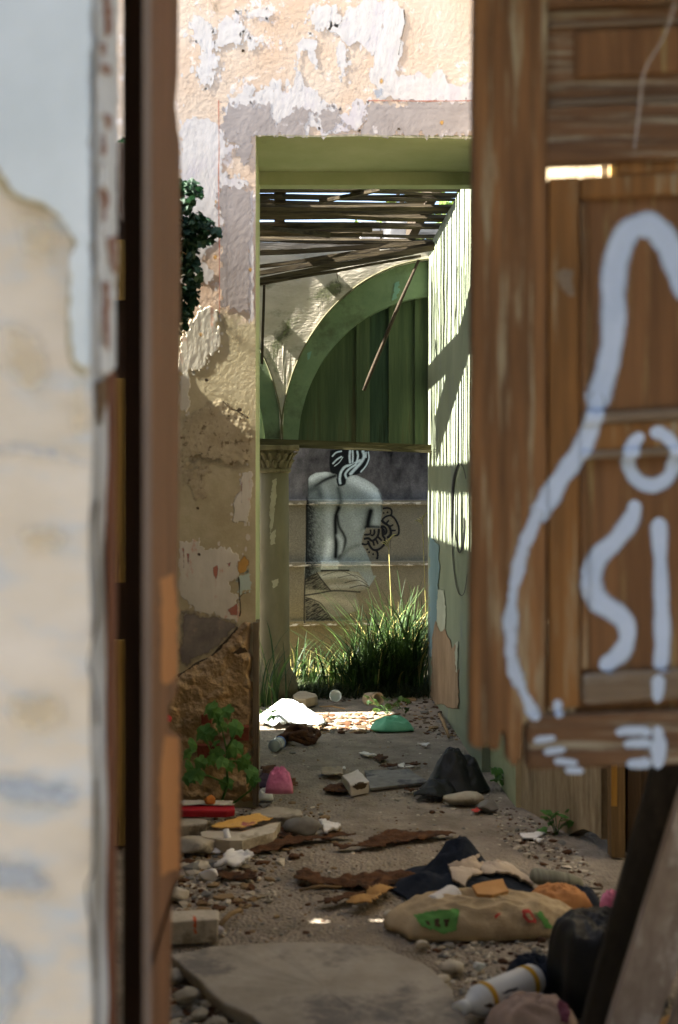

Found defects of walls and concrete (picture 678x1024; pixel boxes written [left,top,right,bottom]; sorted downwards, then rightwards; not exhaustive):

flaking render [169,0,471,802]